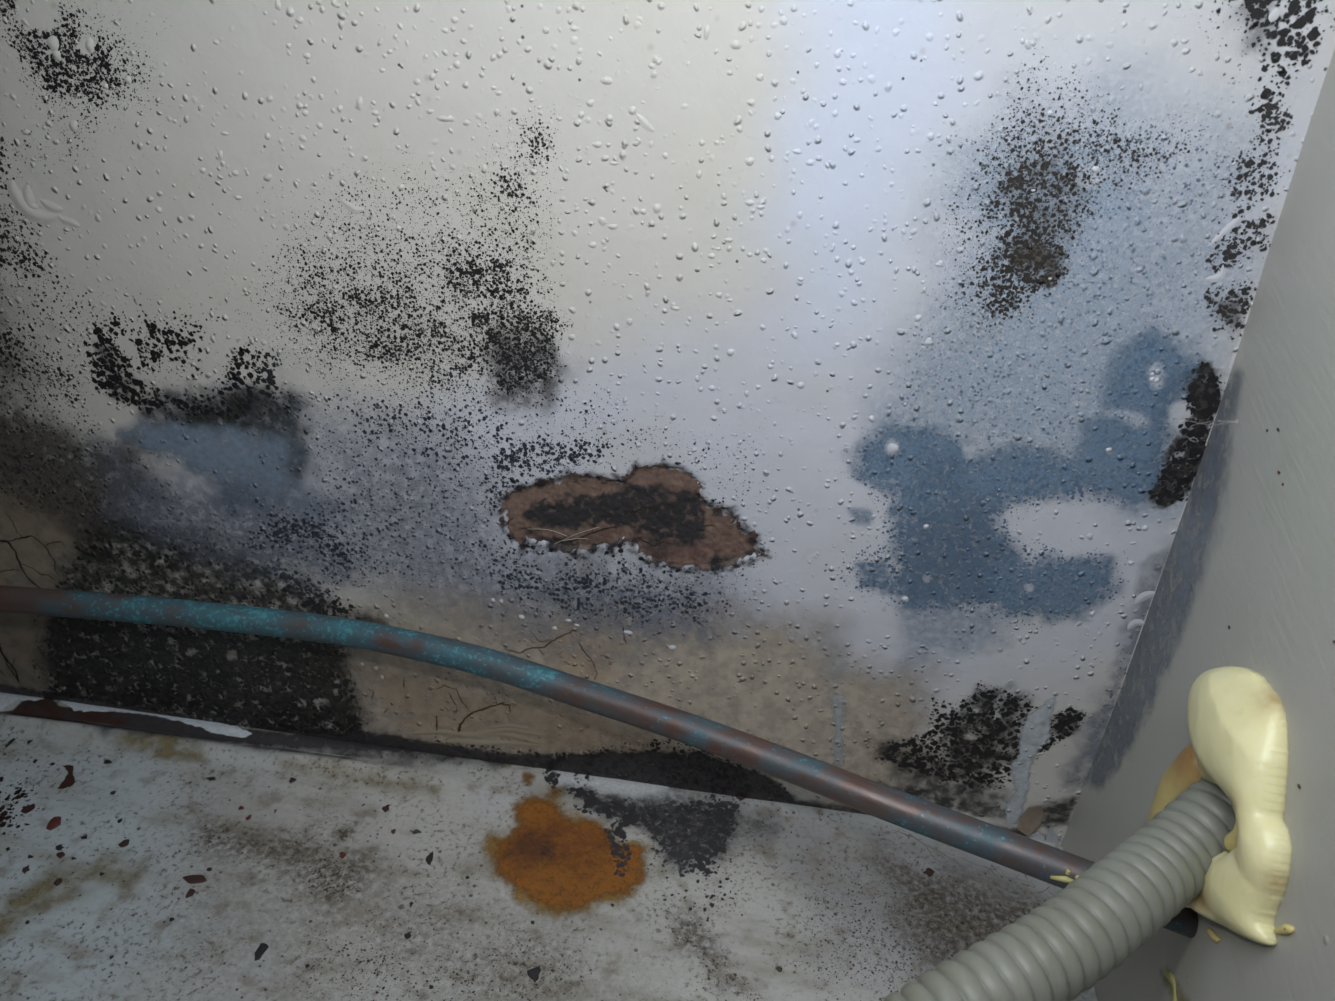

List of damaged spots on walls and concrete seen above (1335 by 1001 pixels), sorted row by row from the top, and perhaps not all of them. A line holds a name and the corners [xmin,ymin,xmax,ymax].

water stain [0,0,1038,836]
water stain [839,0,1335,825]
crack [0,513,66,588]
peeling [496,459,769,580]
crack [0,644,20,683]
spalling [58,765,75,789]
water stain [0,612,869,934]
rust [484,773,645,915]